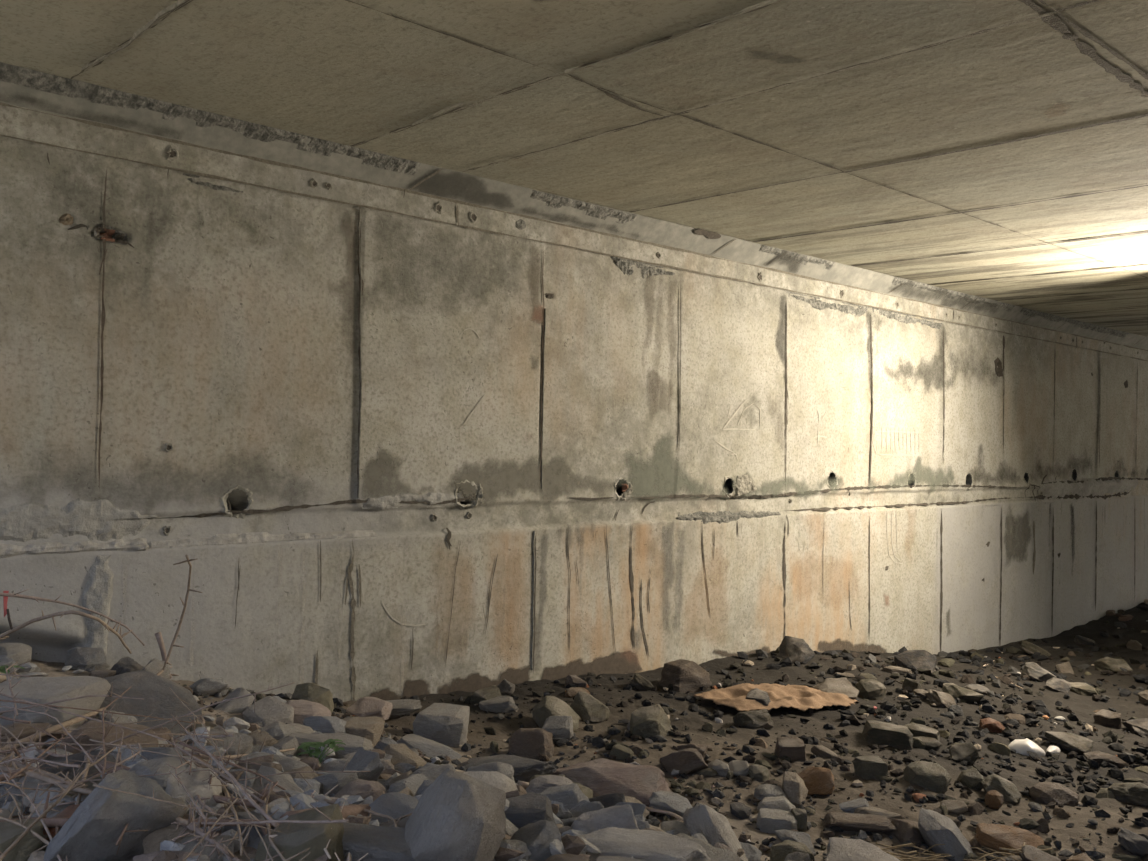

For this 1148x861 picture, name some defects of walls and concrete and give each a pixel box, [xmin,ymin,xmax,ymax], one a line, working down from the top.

water stain [412,173,511,207]
water stain [900,331,957,388]
water stain [364,451,409,498]
water stain [452,459,613,504]
water stain [628,438,726,500]
water stain [745,478,842,497]